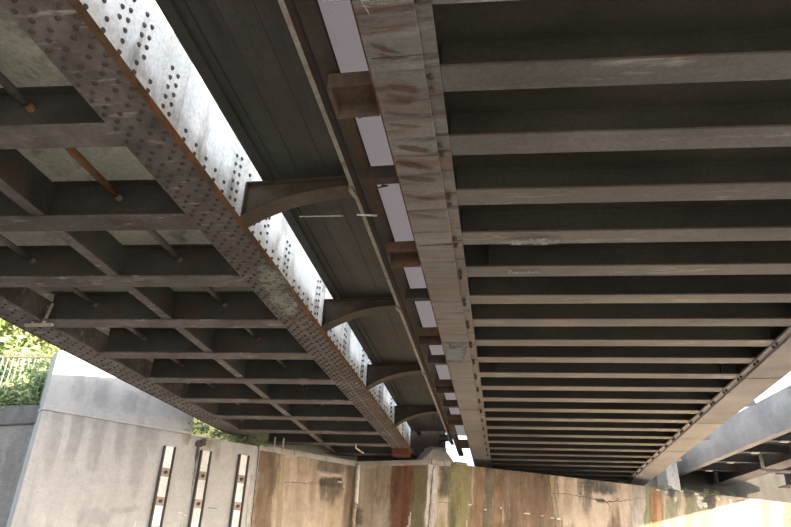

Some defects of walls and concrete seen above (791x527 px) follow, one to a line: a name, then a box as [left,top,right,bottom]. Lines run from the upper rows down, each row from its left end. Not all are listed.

rust [350,0,486,527]
water stain [298,457,354,527]
crack [556,488,640,505]
water stain [586,480,616,494]
rust [650,488,664,527]